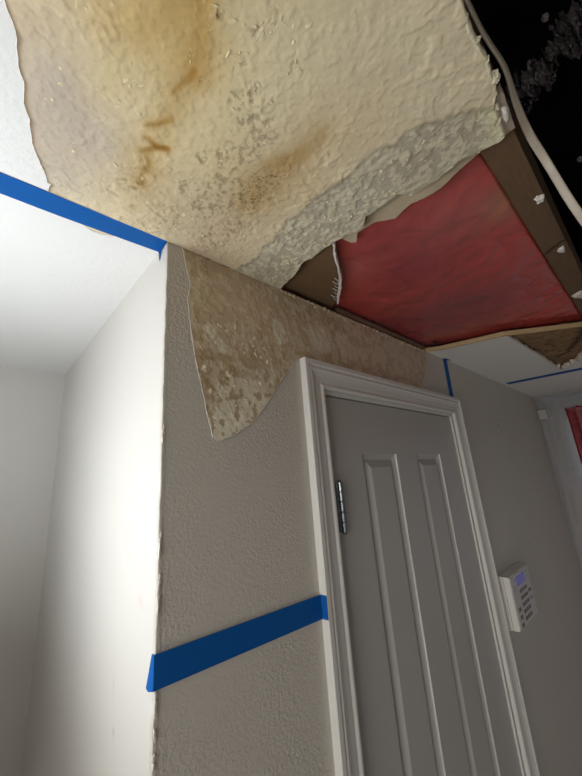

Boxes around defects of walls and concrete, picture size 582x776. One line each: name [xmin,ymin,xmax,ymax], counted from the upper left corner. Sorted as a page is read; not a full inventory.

peeling [182,248,427,442]